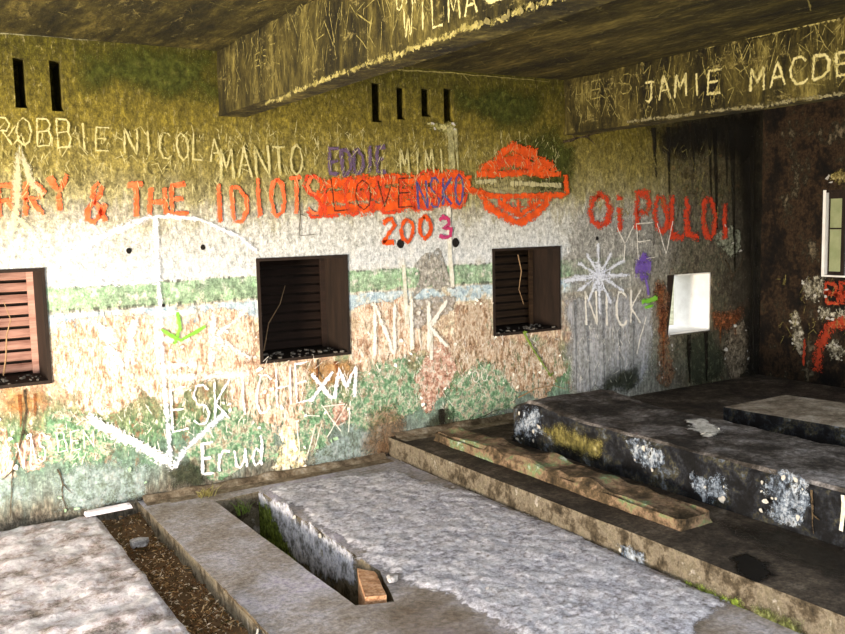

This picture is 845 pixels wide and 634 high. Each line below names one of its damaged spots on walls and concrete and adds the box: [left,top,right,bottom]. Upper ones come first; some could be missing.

leakage [707,118,736,272]
rust [655,286,667,367]
crack [2,389,37,518]
crack [57,469,72,507]